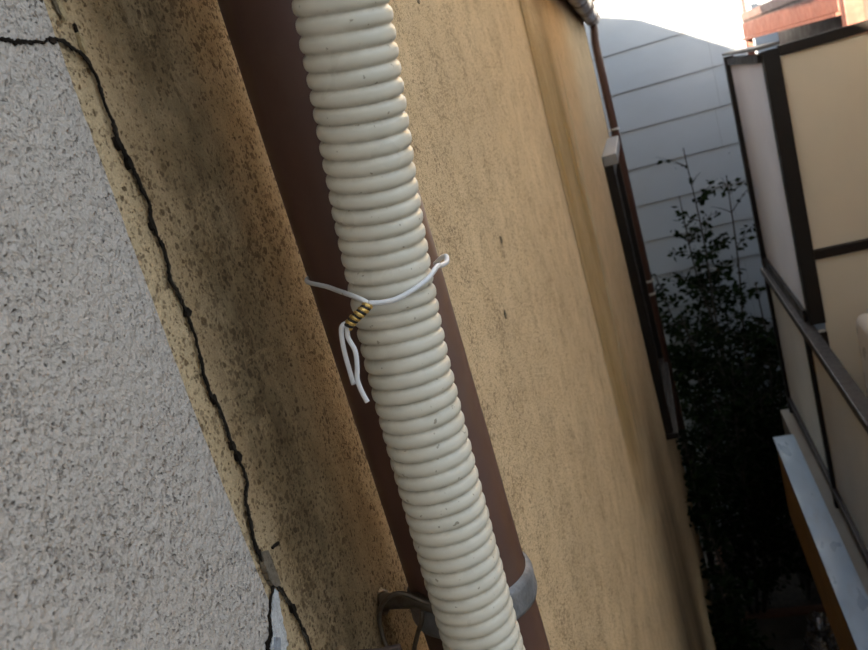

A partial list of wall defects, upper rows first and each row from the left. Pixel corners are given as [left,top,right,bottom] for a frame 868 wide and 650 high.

crack [0,36,312,650]
spalling [269,589,291,650]